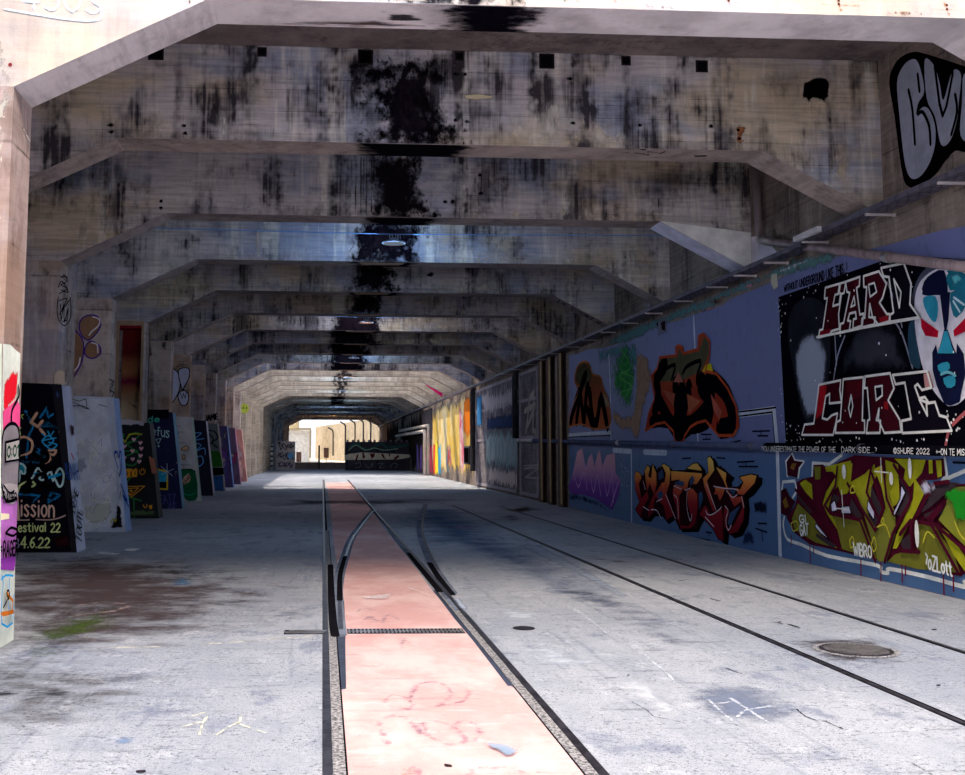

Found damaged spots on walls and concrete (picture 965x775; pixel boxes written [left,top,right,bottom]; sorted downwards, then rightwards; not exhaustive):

peeling [0,43,9,129]
water stain [14,558,222,647]